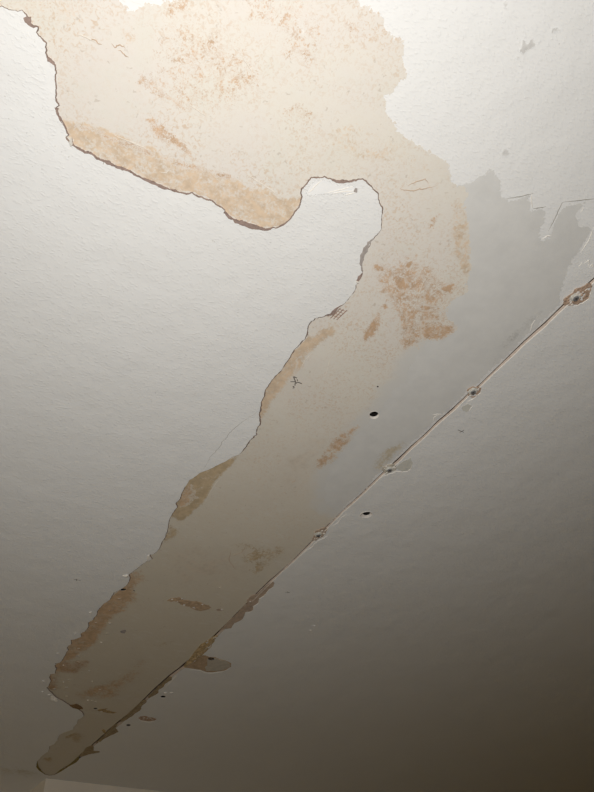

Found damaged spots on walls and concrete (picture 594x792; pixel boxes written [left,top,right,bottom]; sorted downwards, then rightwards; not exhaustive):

damp [48,569,148,692]
damp [62,116,301,227]
damp [164,455,239,543]
peeling [0,0,469,776]
crack [143,278,594,701]
peeling [323,169,594,512]